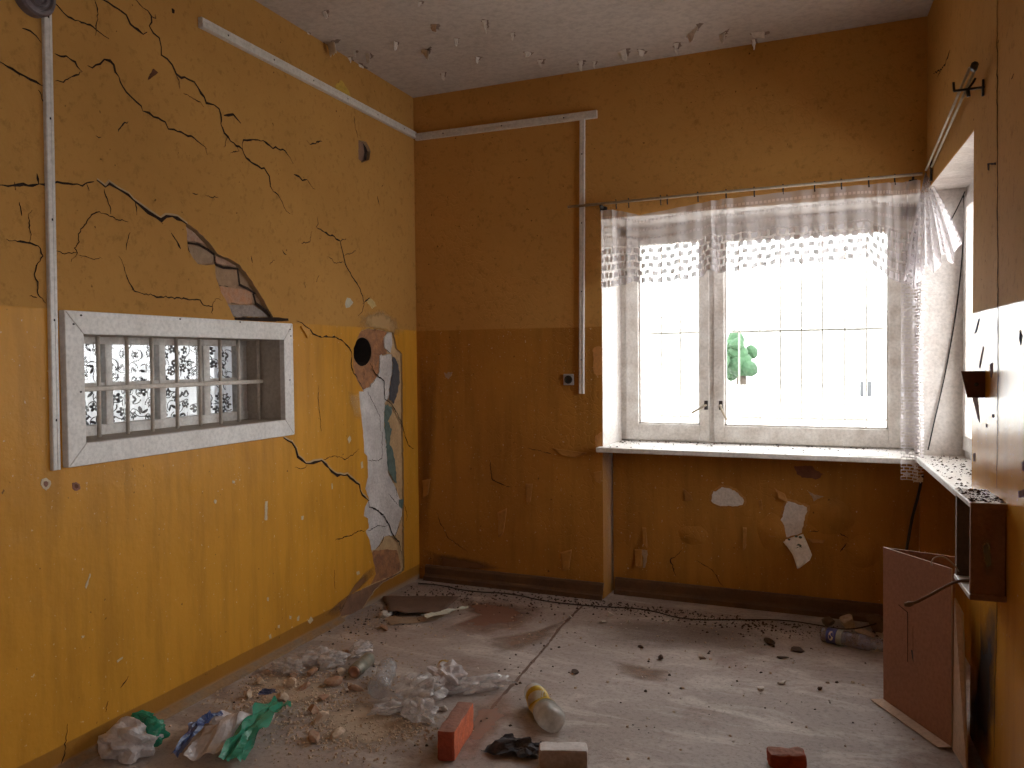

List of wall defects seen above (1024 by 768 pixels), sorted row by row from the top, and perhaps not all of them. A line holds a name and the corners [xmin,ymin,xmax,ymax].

crack [0,0,322,214]
spalling [358,140,371,162]
crack [0,174,218,313]
spalling [186,224,310,338]
crack [251,218,370,316]
crack [298,321,364,390]
crack [284,436,369,501]
spalling [340,328,405,618]
flaking render [709,485,747,509]
flaking render [775,465,824,539]